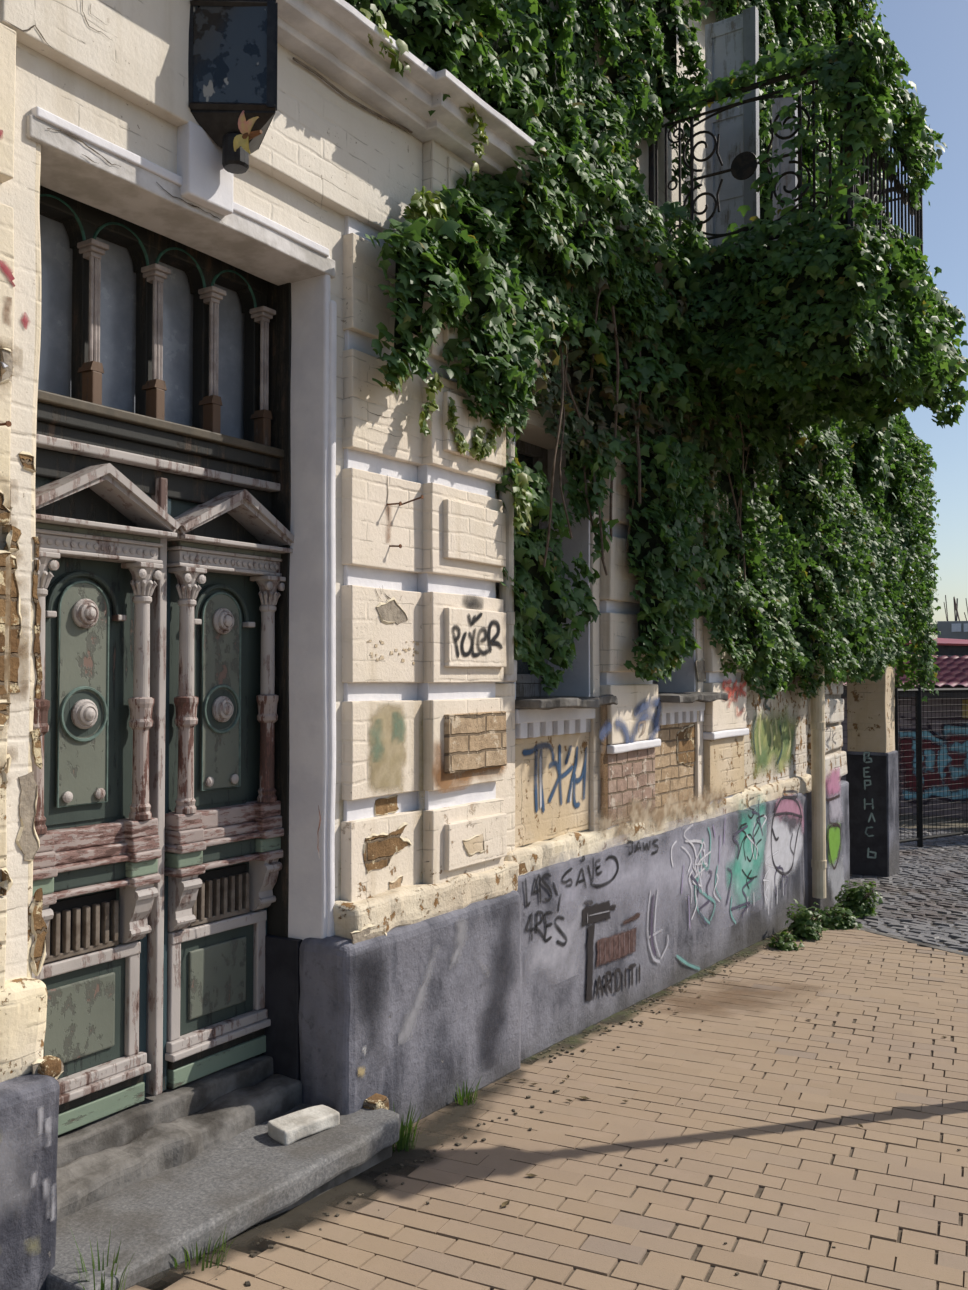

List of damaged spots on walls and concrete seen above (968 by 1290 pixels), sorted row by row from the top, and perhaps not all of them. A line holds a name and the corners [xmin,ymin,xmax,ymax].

peeling [0,490,43,730]
spalling [1,728,42,862]
spalling [0,867,13,896]
spalling [29,888,47,976]
spalling [350,922,387,945]
leakage [359,959,383,1037]
leakage [398,962,432,1043]
leakage [484,925,512,1060]